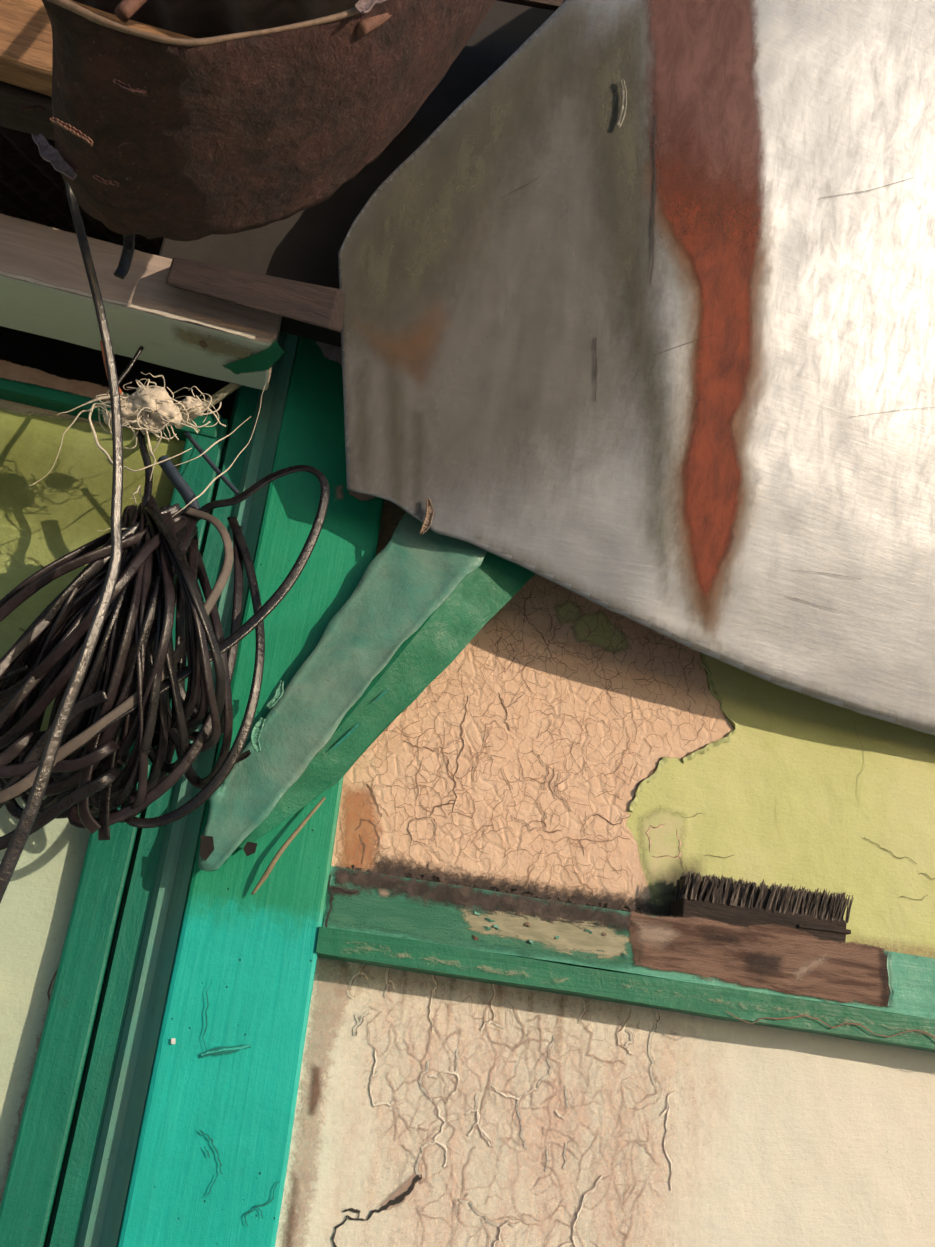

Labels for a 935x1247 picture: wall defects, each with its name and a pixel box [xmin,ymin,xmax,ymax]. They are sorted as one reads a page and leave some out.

rust [19,104,94,147]
peeling [336,485,406,556]
rust [648,0,765,621]
peeling [282,574,935,1247]